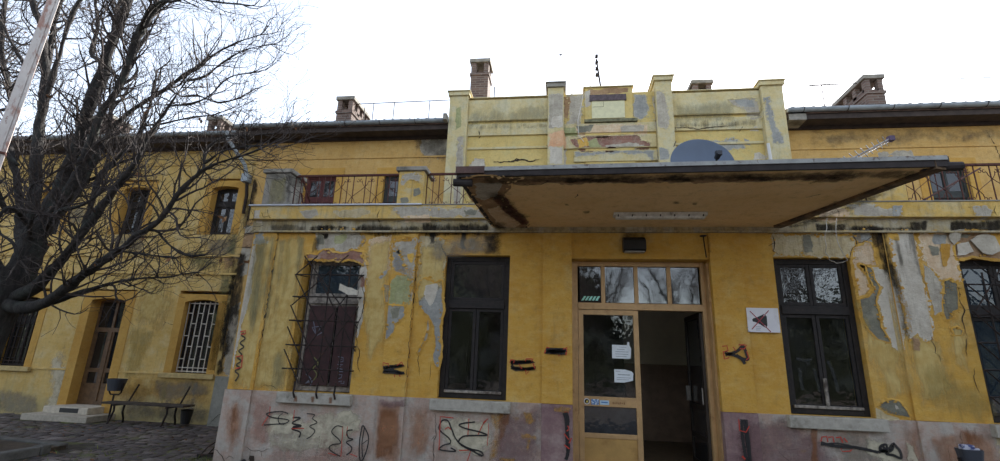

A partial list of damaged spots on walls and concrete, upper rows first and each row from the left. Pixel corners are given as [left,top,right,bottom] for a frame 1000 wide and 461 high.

spalling [547,87,670,165]
peeling [706,96,784,160]
damp [245,179,258,227]
damp [486,171,911,223]
peeling [223,107,853,390]
damp [191,235,272,373]
peeling [771,202,1000,421]